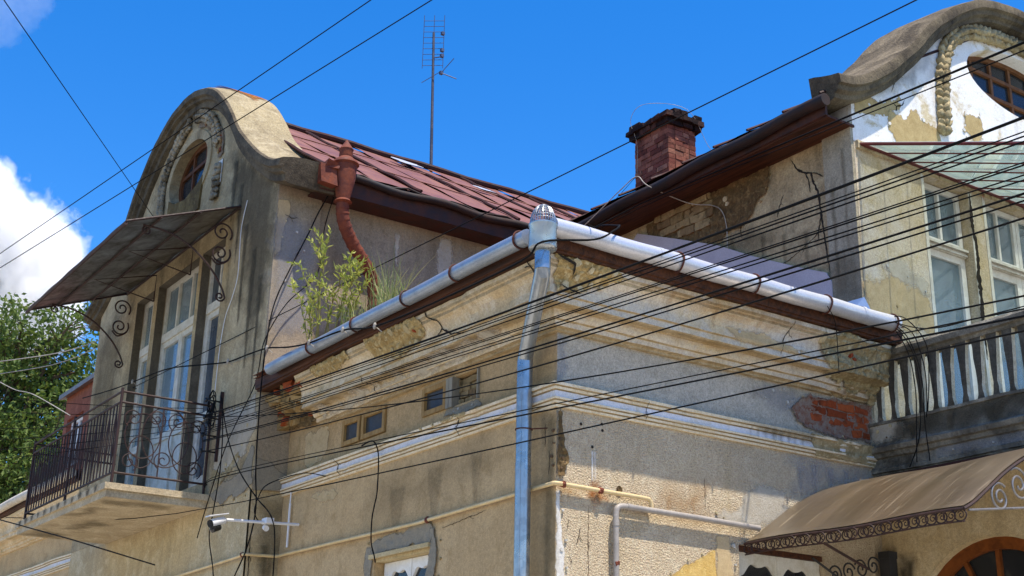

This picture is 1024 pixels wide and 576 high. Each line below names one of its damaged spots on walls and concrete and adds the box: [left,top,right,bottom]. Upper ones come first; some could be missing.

peeling [854,96,941,142]
peeling [962,111,983,141]
spalling [646,166,771,243]
crack [783,159,830,271]
damp [231,162,273,381]
spalling [553,253,623,293]
crack [969,193,988,360]
spalling [363,316,425,360]
peeling [211,331,513,507]
spalling [549,411,569,476]
spalling [764,328,901,468]